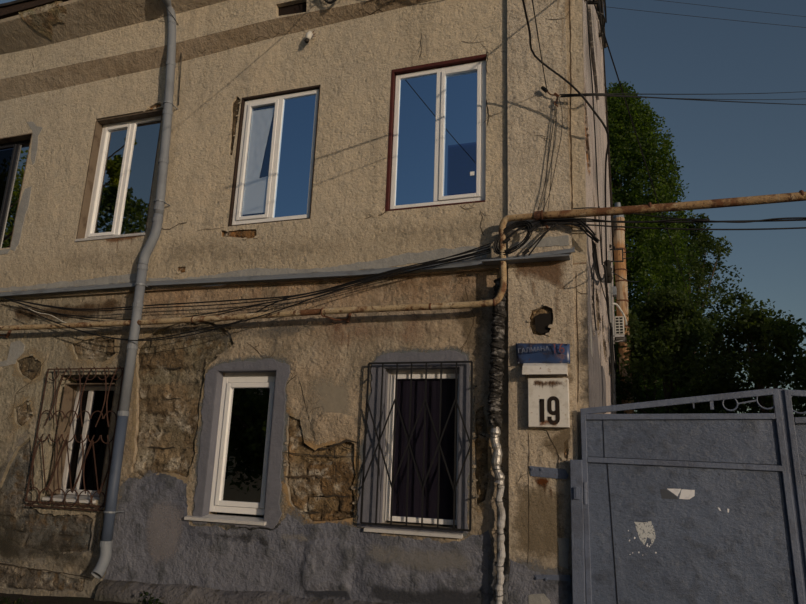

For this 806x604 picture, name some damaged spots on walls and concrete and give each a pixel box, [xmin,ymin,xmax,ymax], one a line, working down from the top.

flaking render [18,0,67,41]
flaking render [222,229,258,240]
flaking render [13,349,44,383]
flaking render [69,332,119,367]
flaking render [130,314,236,481]
flaking render [281,408,360,525]
flaking render [0,396,105,592]